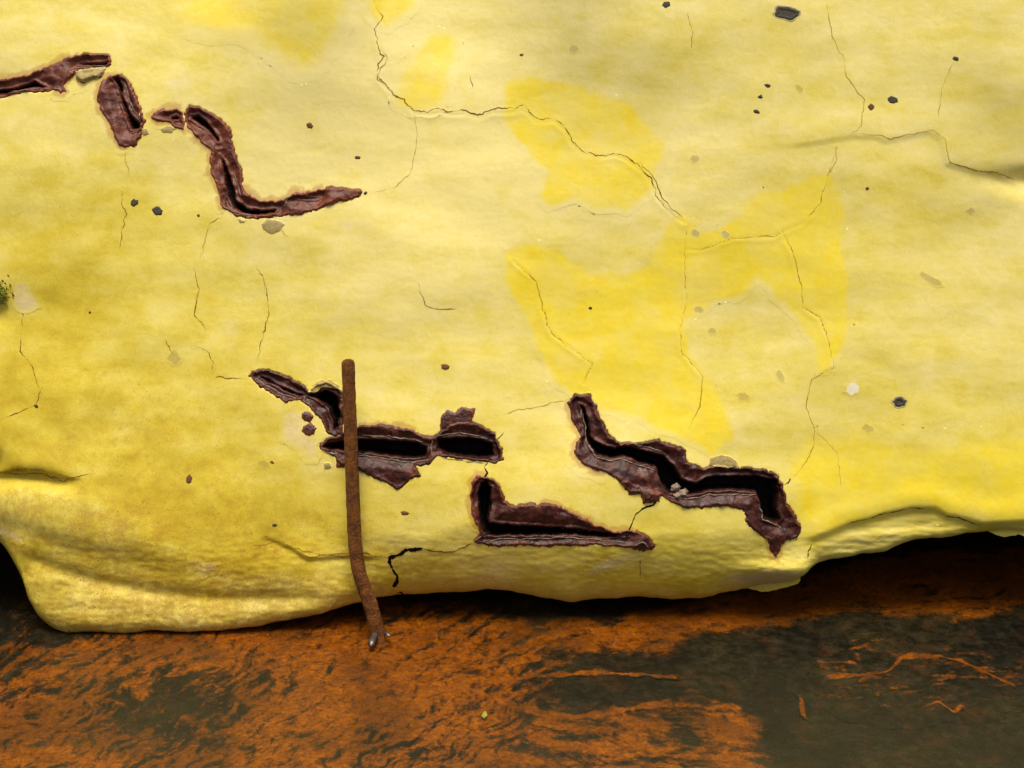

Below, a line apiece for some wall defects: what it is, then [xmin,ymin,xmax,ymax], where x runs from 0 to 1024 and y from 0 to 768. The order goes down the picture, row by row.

crack [808,9,1011,217]
crack [0,0,841,595]
peeling [271,402,324,465]
rust [0,534,1024,768]